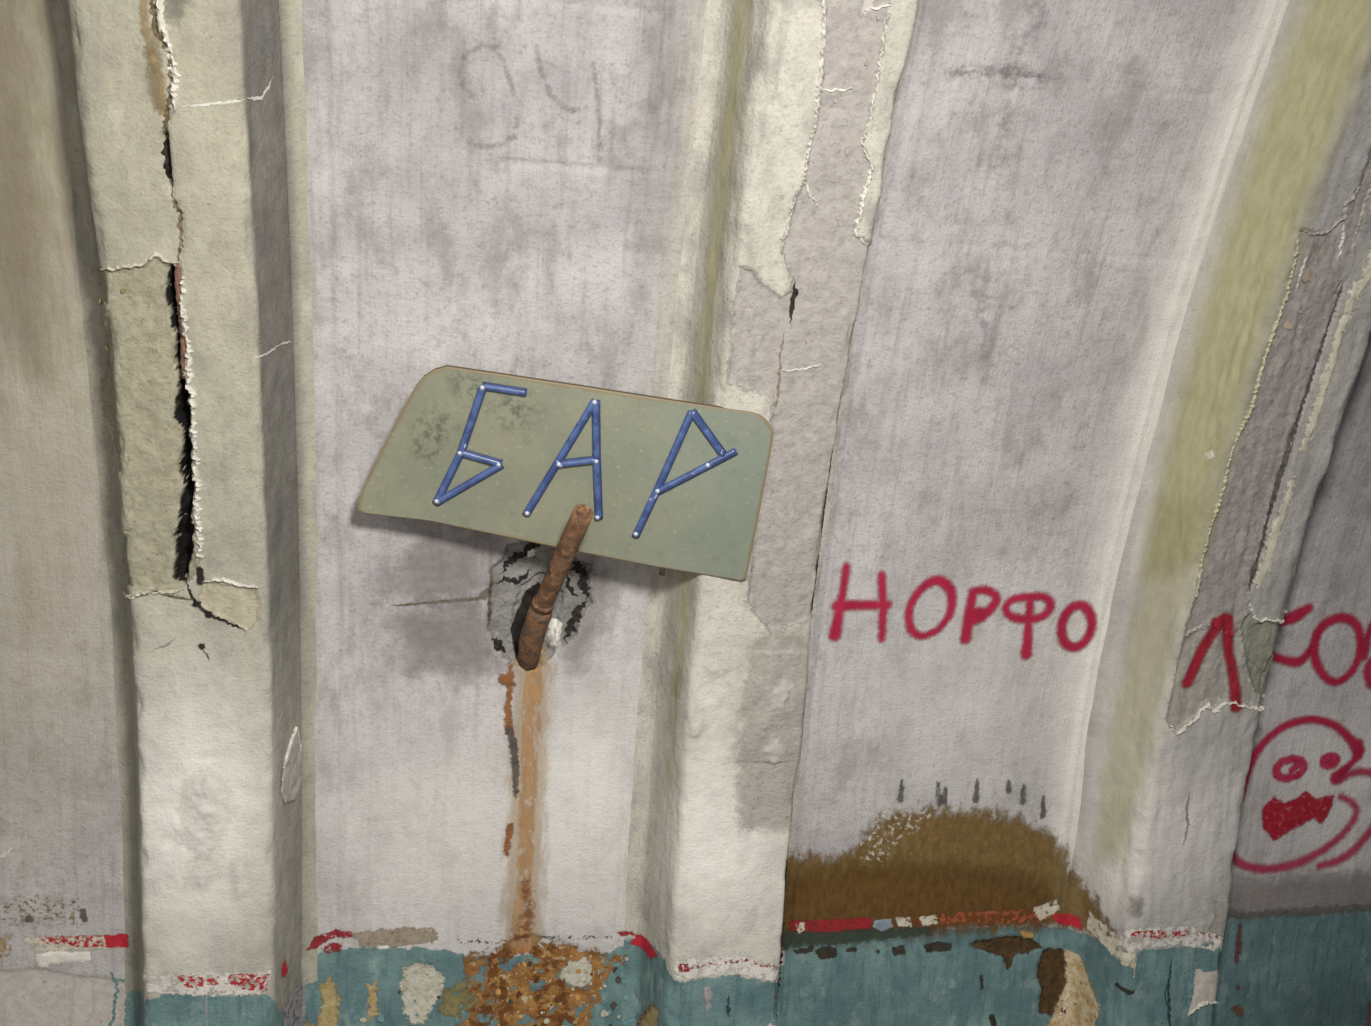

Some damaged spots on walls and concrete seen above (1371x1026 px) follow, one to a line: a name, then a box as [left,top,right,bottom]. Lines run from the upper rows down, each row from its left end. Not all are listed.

crack [126,0,273,662]
spalling [727,0,891,634]
spalling [1165,150,1371,735]
spalling [487,541,556,666]
spalling [539,557,594,667]
rust [455,648,627,1026]
peeling [0,933,129,1026]
peeling [175,959,340,1026]
peeling [360,962,473,1025]